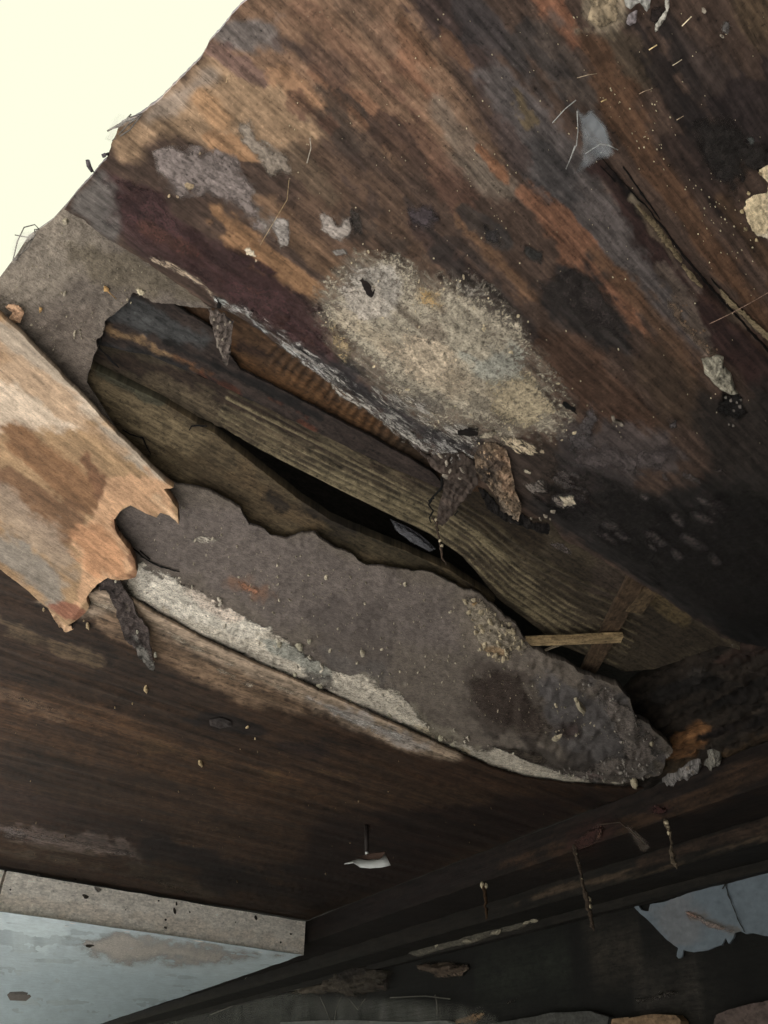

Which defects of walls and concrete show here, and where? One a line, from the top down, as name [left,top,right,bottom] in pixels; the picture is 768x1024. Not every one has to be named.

leakage [239,124,291,175]
crack [600,155,768,352]
peeling [6,304,24,323]
peeling [208,308,234,366]
spalling [359,278,375,297]
leakage [114,146,768,625]
peeling [416,427,555,526]
peeling [42,608,90,632]
spalling [98,561,670,789]